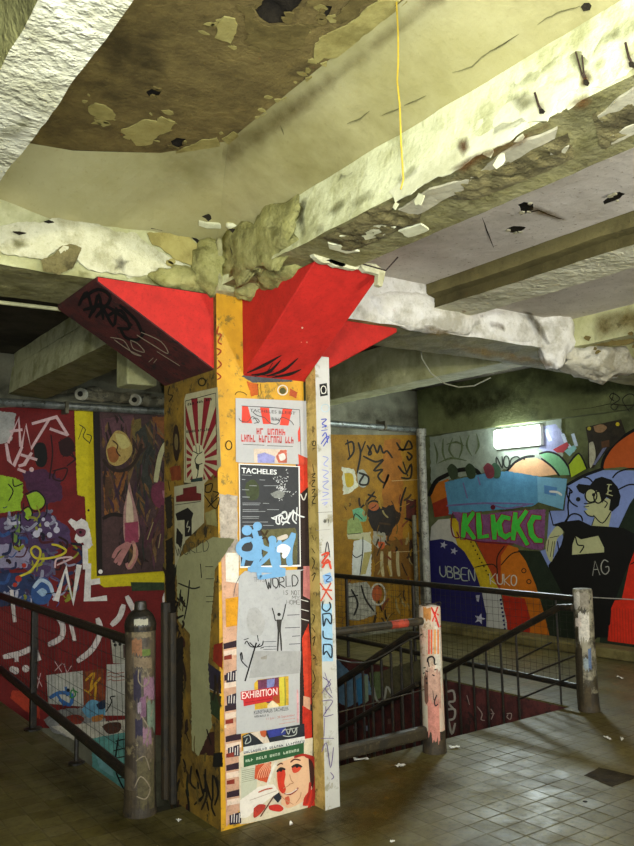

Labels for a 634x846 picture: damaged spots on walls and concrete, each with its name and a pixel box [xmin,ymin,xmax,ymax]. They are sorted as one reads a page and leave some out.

peeling [198,16,238,50]
spalling [255,0,302,24]
peeling [294,0,407,84]
crack [452,34,519,73]
crack [537,6,579,25]
peeling [82,94,116,127]
peeling [121,110,238,153]
spalling [310,42,634,288]
spalling [199,214,235,233]
peeling [0,218,197,279]